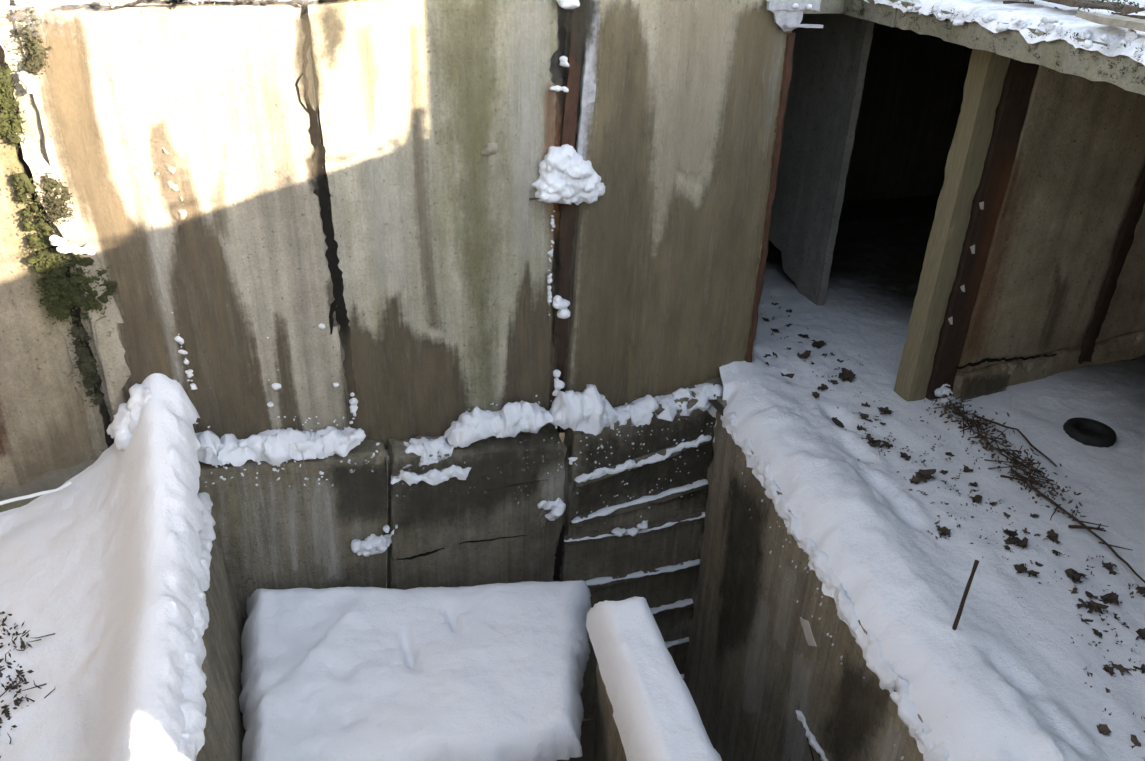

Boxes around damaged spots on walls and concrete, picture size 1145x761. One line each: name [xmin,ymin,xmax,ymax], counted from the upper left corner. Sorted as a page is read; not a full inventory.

damp [35,14,303,440]
crack [0,0,351,448]
crack [553,203,561,397]
crack [549,7,569,147]
damp [572,0,790,407]
rust [745,33,796,363]
crack [396,535,527,560]
crack [553,526,565,581]